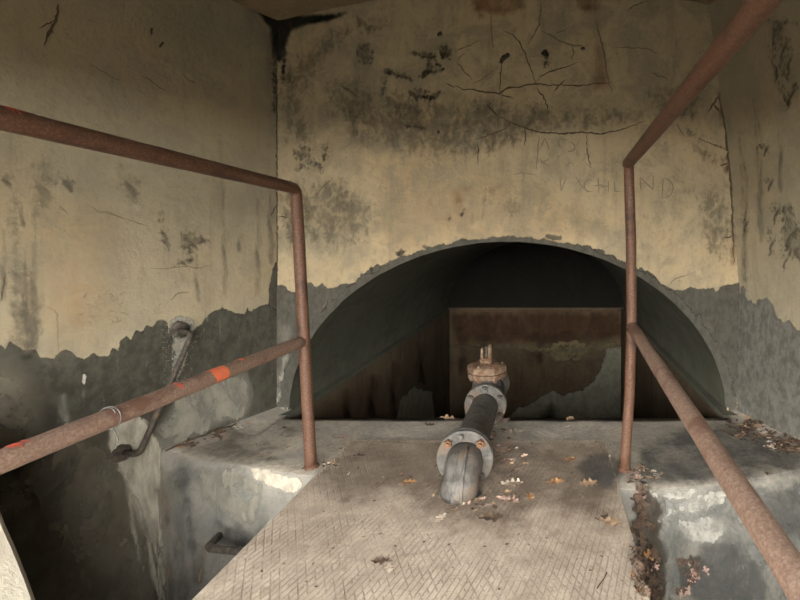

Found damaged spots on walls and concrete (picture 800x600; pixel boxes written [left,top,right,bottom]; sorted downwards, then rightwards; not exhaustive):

crack [38,4,59,46]
water stain [259,13,342,112]
water stain [381,45,451,101]
crack [448,1,668,164]
water stain [179,232,209,266]
peeling [310,234,626,340]
peeling [169,316,194,383]
peeling [156,377,248,448]
peeling [396,386,435,418]
corrosion [452,313,620,372]
peeling [509,347,621,418]
peeling [637,269,736,408]